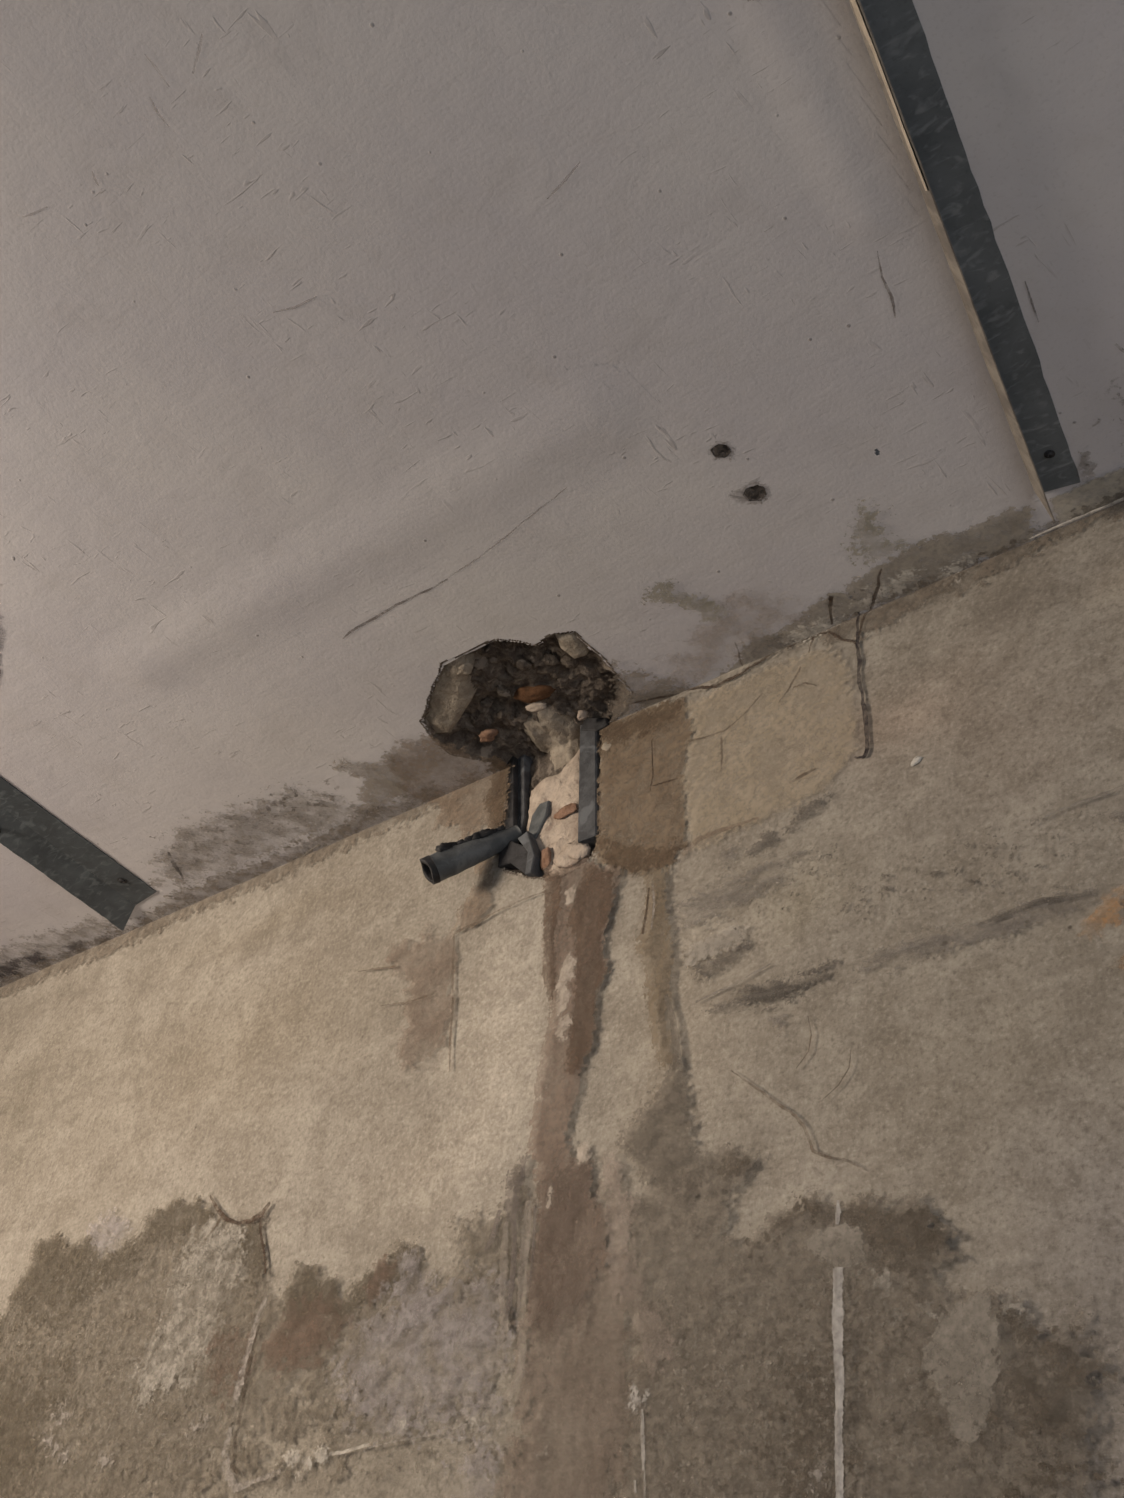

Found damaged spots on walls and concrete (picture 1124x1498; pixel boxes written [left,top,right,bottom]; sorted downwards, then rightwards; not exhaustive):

damp [0,731,515,998]
crack [343,491,563,639]
spalling [419,506,1036,880]
crack [632,569,882,762]
damp [593,579,1124,1498]
damp [0,1155,536,1498]